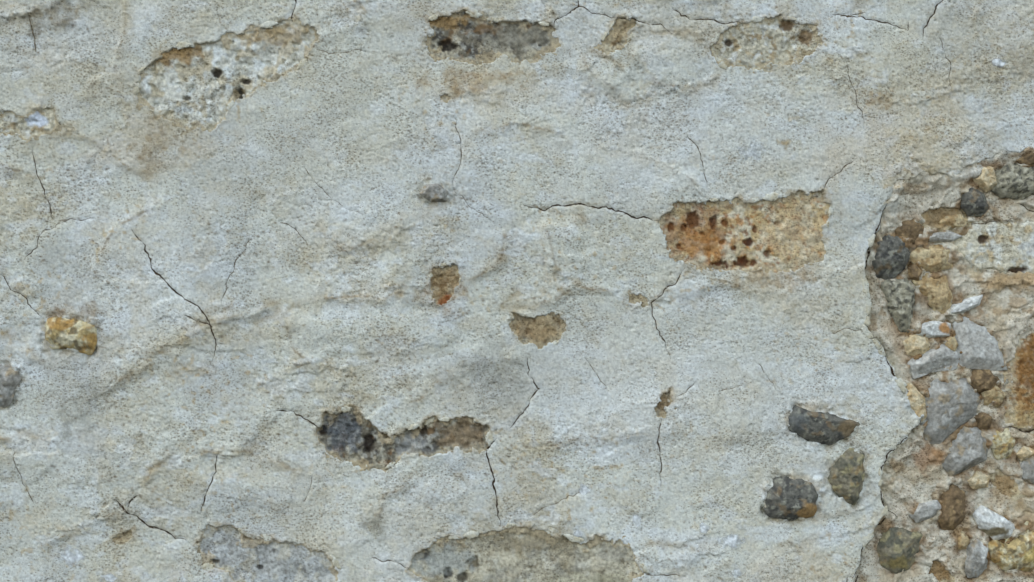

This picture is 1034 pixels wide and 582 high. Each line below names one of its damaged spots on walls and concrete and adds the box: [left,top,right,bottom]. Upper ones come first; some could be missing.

spalling [133,17,318,133]
spalling [424,9,561,66]
spalling [708,15,822,73]
spalling [659,191,833,273]
crack [131,229,252,364]
spalling [509,312,566,349]
spalling [854,147,1034,582]
spalling [316,406,493,472]
spalling [197,524,341,582]
spalling [408,523,649,582]